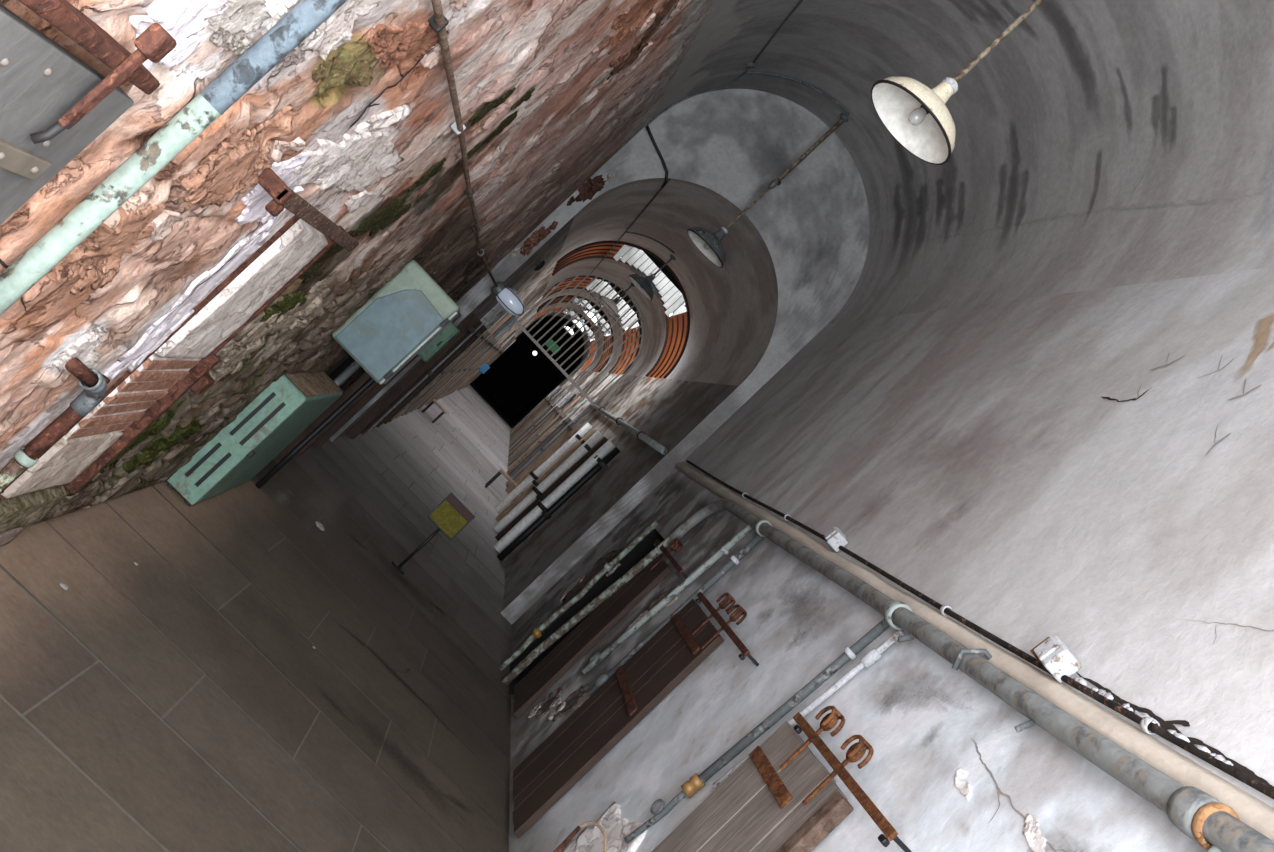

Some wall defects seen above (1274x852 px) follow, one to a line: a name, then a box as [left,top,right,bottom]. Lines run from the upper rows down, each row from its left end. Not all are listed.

flaking render [129,0,301,72]
crack [348,44,439,130]
flaking render [46,103,412,384]
crack [1179,619,1274,643]
crack [969,735,1079,852]